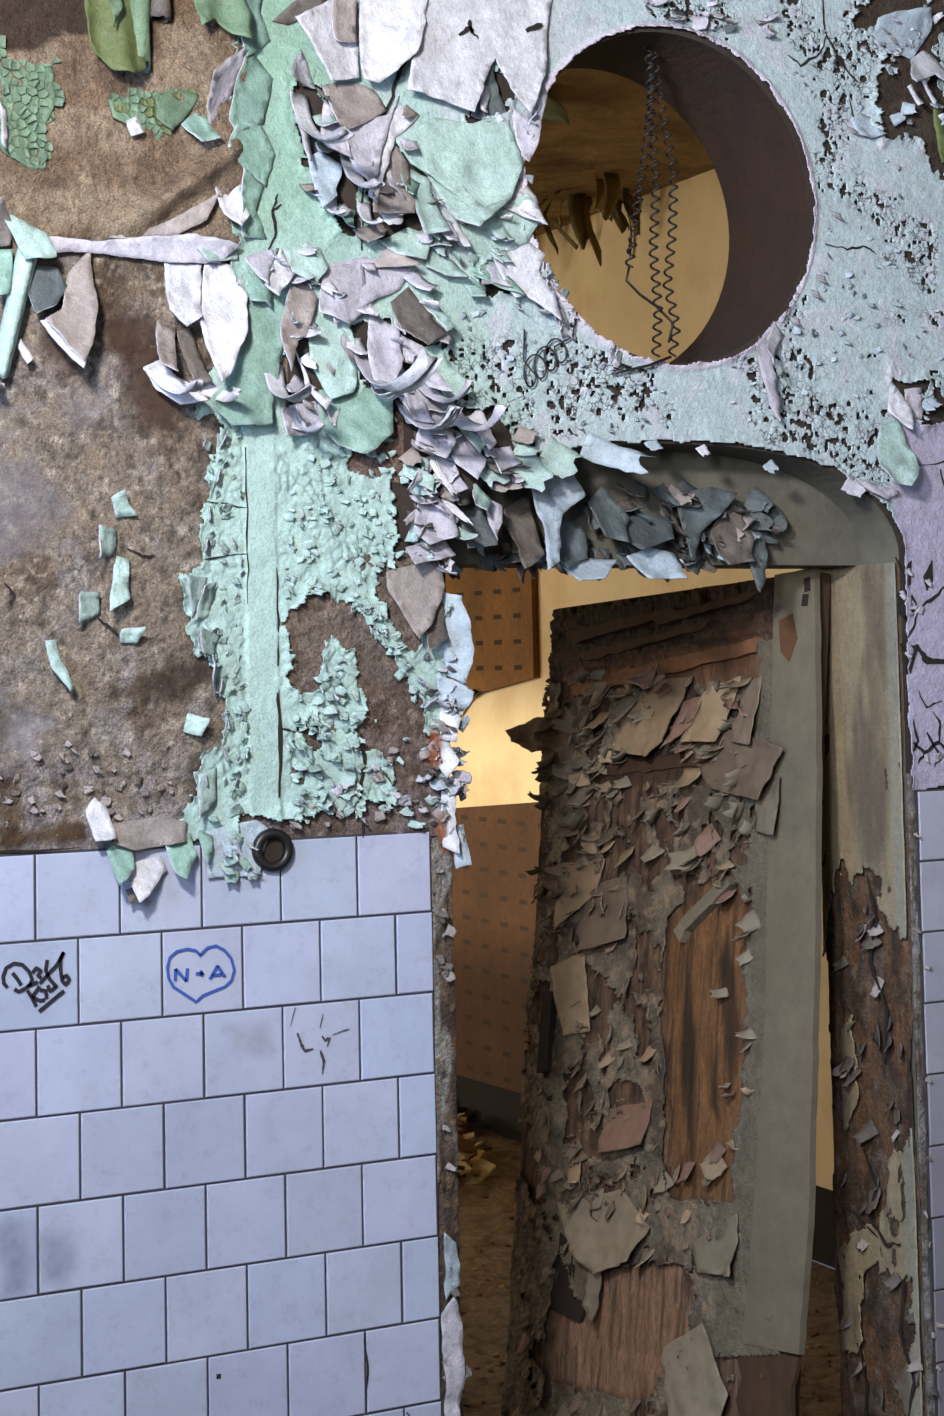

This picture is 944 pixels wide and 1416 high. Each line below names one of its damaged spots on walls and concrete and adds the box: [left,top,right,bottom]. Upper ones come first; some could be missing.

peeling [644,0,790,39]
flaking render [793,0,944,180]
peeling [551,172,640,267]
peeling [731,247,914,422]
peeling [644,440,663,451]
peeling [695,444,711,457]
peeling [763,459,779,474]
peeling [840,380,943,500]
crack [919,461,944,485]
crack [895,557,944,767]
flaking render [289,696,337,785]
flaking render [820,560,944,1416]